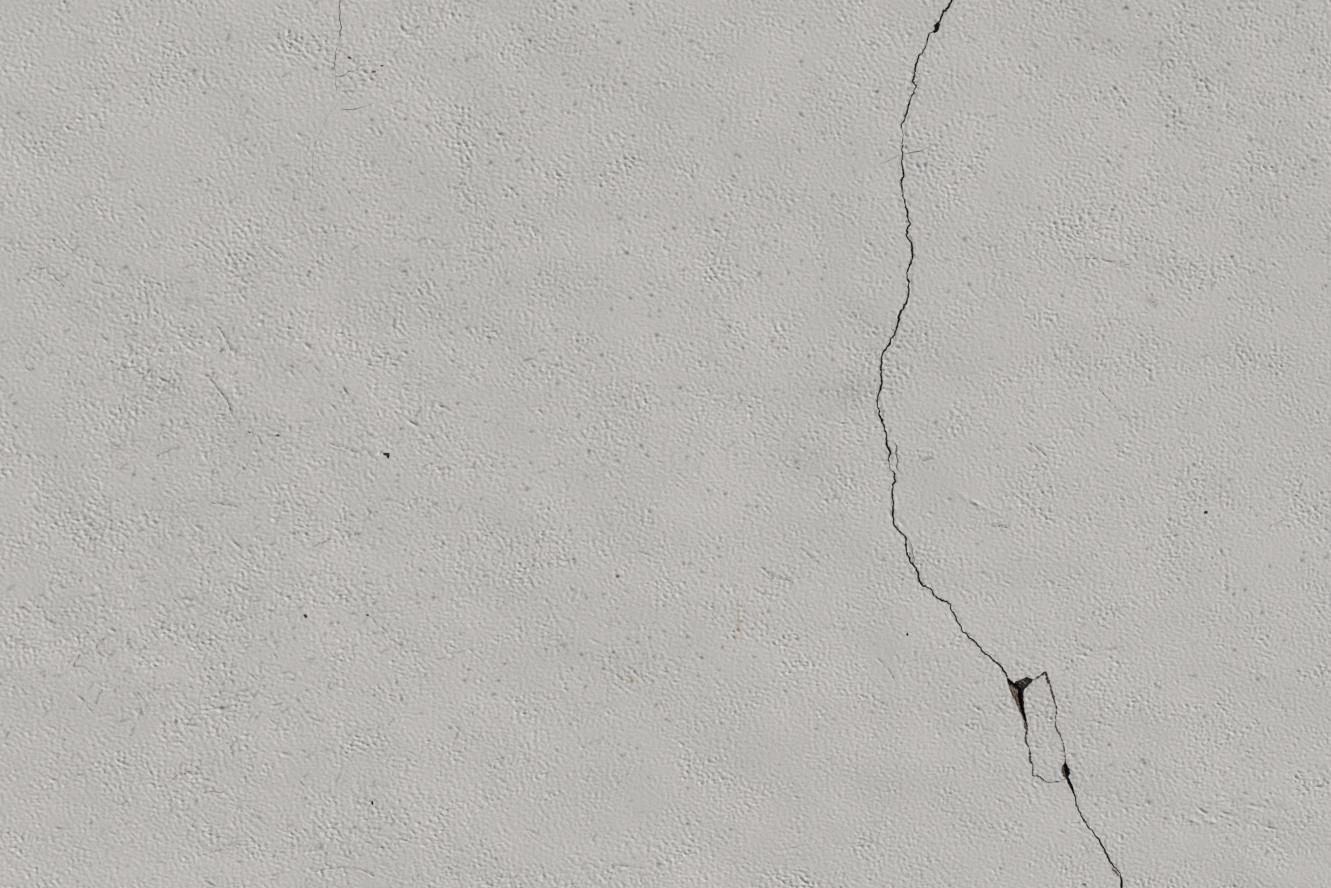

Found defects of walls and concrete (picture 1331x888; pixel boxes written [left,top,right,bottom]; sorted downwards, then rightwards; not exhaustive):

crack [876,0,1123,888]